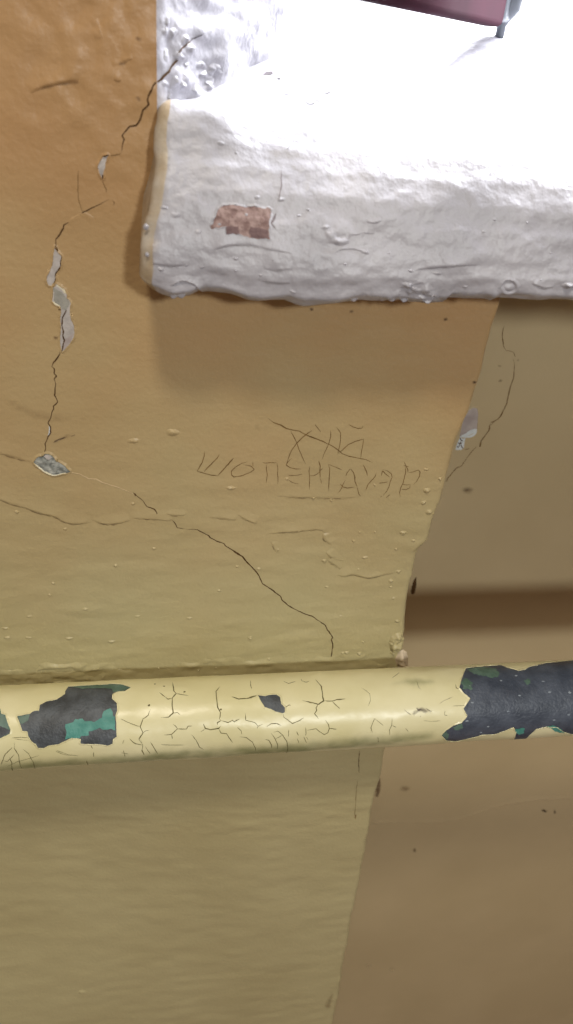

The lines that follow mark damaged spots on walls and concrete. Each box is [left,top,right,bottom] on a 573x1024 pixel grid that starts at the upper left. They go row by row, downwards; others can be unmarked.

crack [111,33,204,156]
crack [55,189,115,245]
spalling [95,152,111,191]
peeling [209,202,273,241]
crack [271,171,282,228]
peeling [44,243,77,354]
crack [44,353,60,452]
peeling [456,406,480,450]
crack [446,328,515,482]
spalling [31,451,72,478]
crack [72,472,334,660]